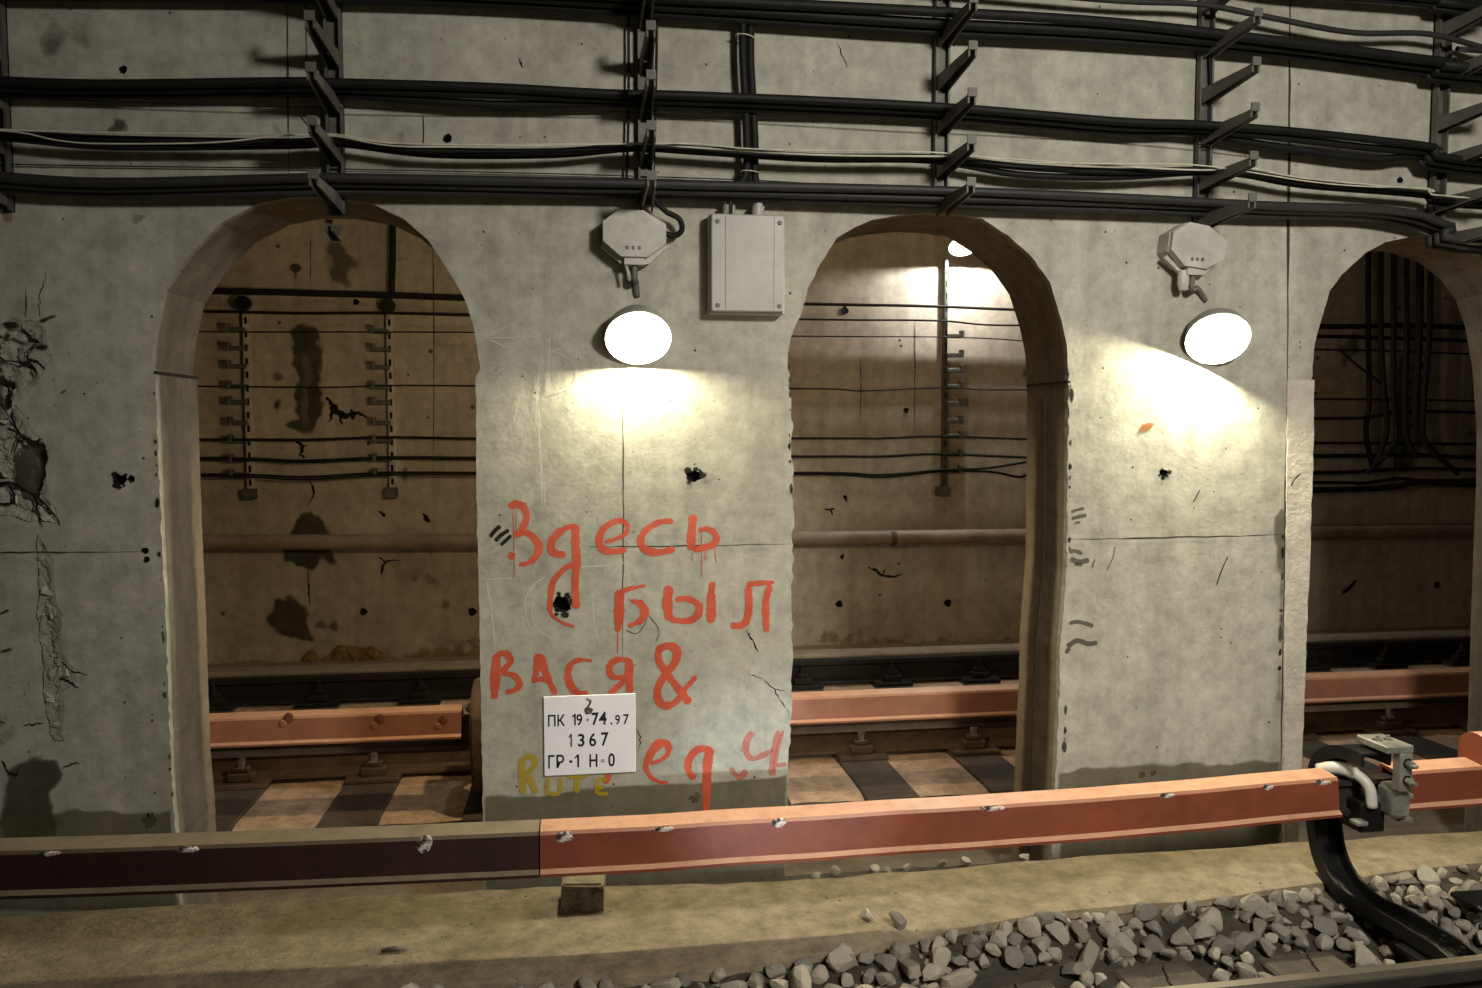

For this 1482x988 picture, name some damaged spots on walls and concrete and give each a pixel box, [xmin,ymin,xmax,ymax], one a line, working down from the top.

leakage [328,243,356,285]
leakage [274,325,323,433]
crack [296,397,367,506]
spalling [0,315,75,741]
leakage [283,512,336,570]
leakage [266,595,337,641]